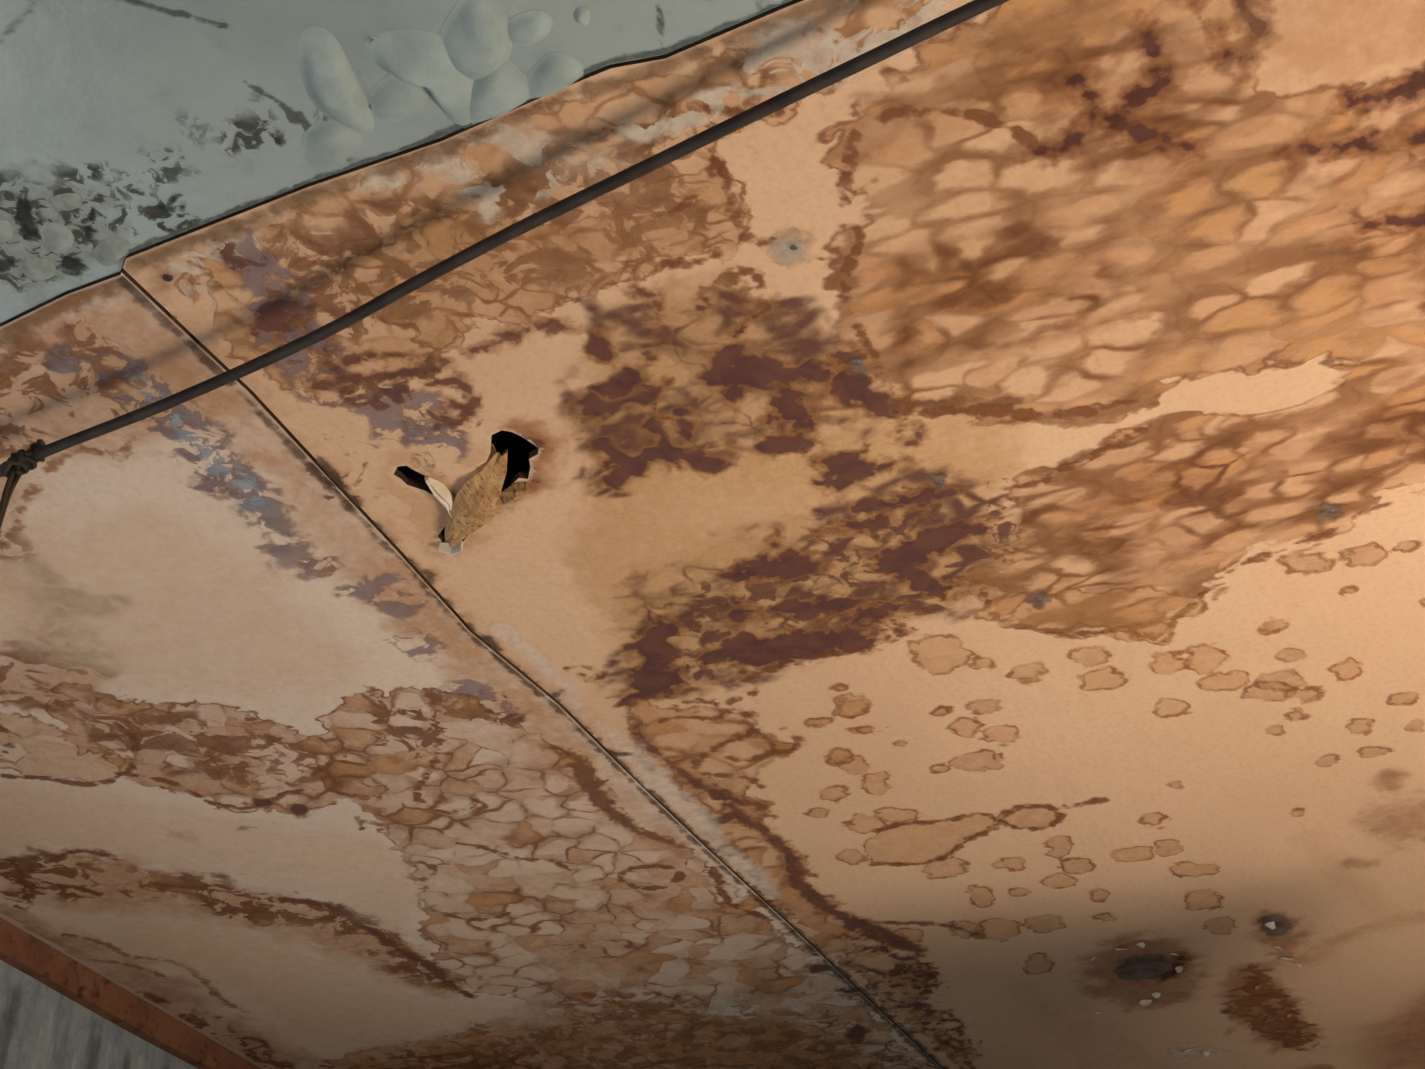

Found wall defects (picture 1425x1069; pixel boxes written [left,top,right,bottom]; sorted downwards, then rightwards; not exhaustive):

crack [126,0,227,28]
spalling [221,117,285,153]
leakage [818,101,935,204]
spalling [0,149,197,290]
leakage [175,47,772,362]
leakage [264,138,754,458]
leakage [1167,644,1325,702]
leakage [0,680,547,853]
leakage [836,798,1109,880]
peeling [688,995,760,1019]
peeling [789,957,885,1005]
peeling [845,1024,870,1042]